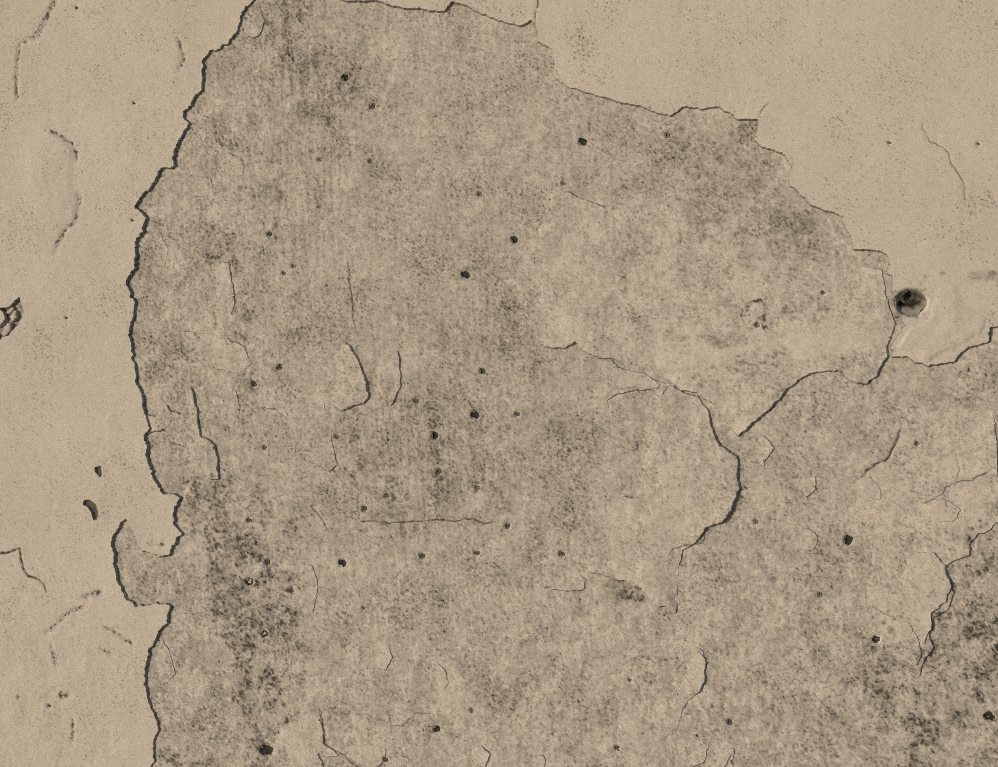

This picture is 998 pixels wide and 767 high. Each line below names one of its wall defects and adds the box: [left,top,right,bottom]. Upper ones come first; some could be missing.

crack [15,1,55,98]
peeling [516,163,896,437]
peeling [202,337,252,374]
peeling [325,343,370,411]
peeling [377,351,402,406]
peeling [263,383,338,472]
peeling [588,386,740,614]
crack [0,547,45,587]
peeling [854,404,998,676]
peeling [373,642,393,671]
peeling [266,691,338,767]
peeling [615,691,651,767]